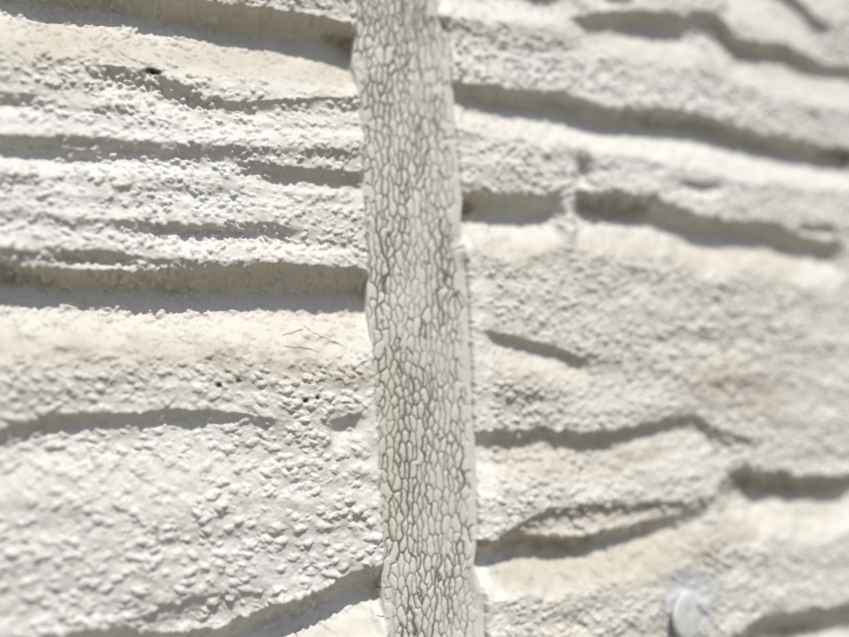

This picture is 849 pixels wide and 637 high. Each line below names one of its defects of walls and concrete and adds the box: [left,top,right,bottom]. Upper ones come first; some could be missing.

crack [354,0,477,637]